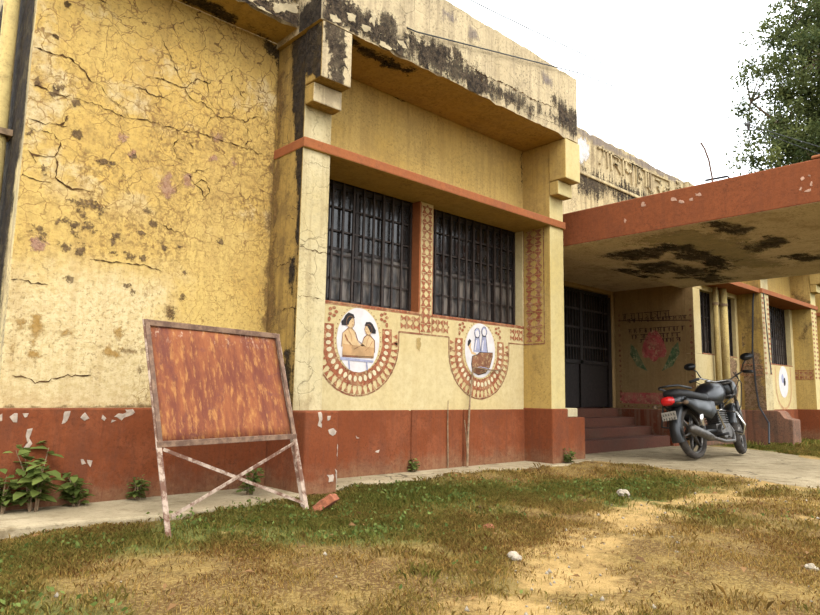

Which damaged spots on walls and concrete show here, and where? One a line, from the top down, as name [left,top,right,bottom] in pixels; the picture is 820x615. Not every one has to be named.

peeling [245,0,299,25]
water stain [0,0,35,306]
spalling [34,76,65,96]
crack [22,34,274,199]
water stain [242,0,680,295]
spalling [29,198,106,255]
spalling [108,233,146,261]
crack [93,259,162,272]
water stain [262,159,280,333]
water stain [598,220,820,283]
water stain [283,305,296,407]
peeling [101,409,135,423]